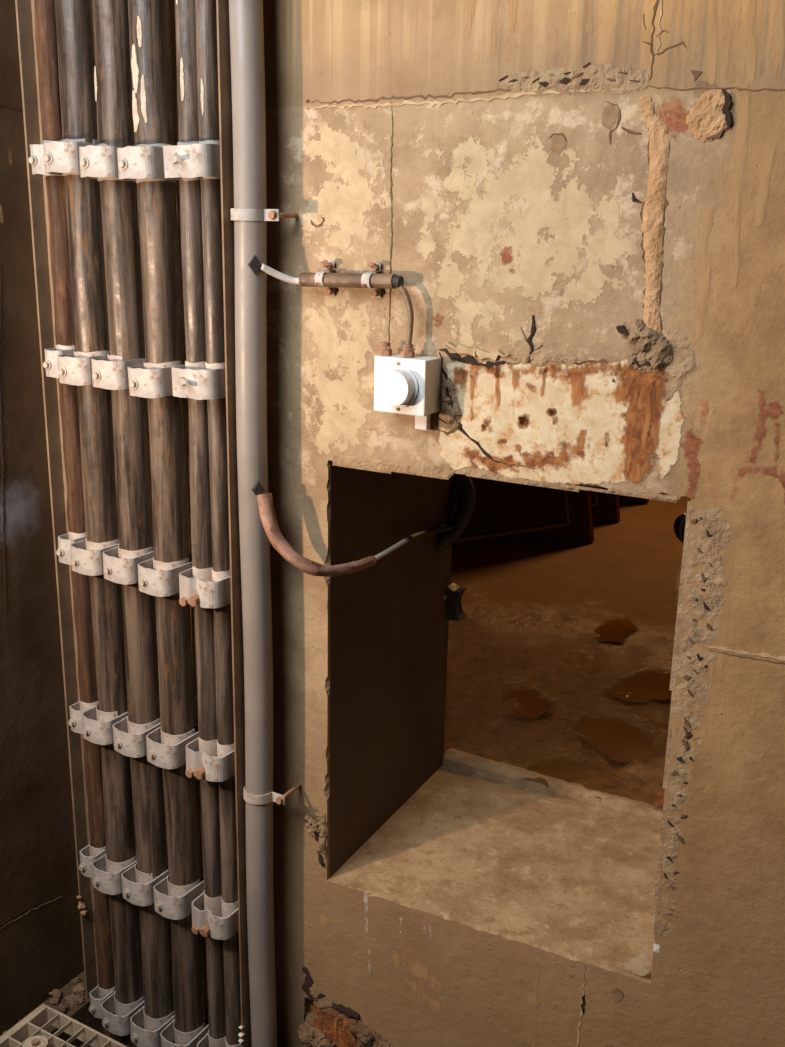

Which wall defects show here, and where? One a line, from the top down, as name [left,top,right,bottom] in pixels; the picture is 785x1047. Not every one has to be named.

crack [642,0,785,91]
crack [305,88,618,342]
rust [453,362,668,482]
peeling [301,62,734,953]
rust [311,1006,355,1047]
spalling [313,998,392,1047]
crack [577,971,586,1047]